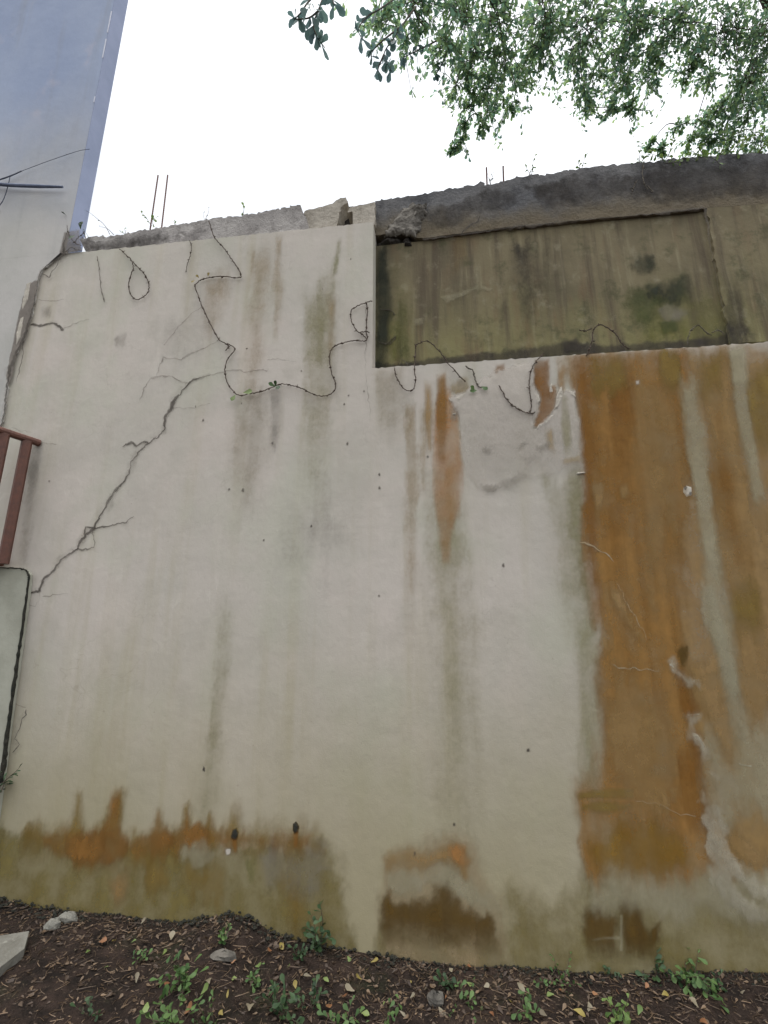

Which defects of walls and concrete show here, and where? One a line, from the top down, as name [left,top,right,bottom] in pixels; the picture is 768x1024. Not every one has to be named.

spalling [377,202,428,247]
crack [0,233,82,427]
damp [375,247,390,368]
corrosion [426,378,459,443]
crack [31,375,208,593]
corrosion [534,348,768,887]
corrosion [25,795,238,869]
damp [0,829,355,951]
damp [379,868,543,969]